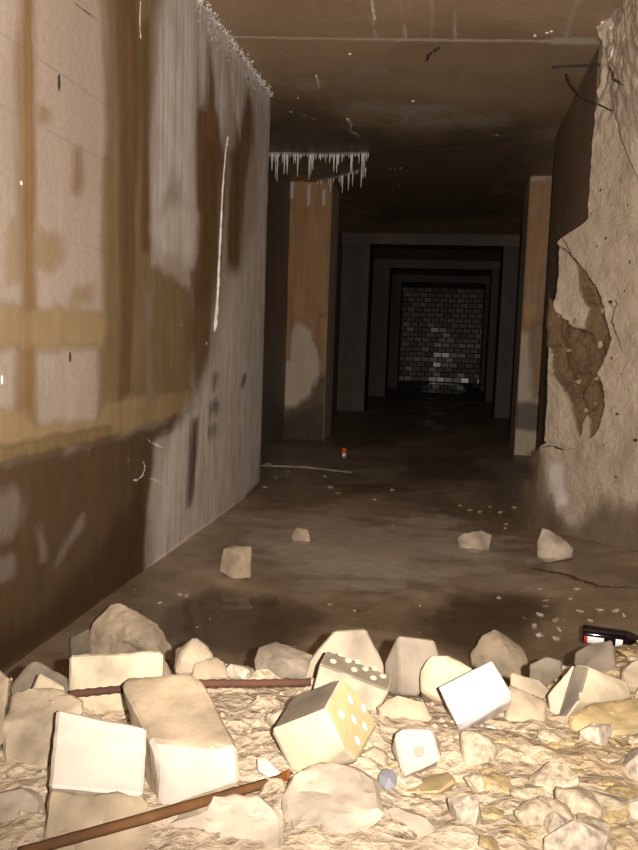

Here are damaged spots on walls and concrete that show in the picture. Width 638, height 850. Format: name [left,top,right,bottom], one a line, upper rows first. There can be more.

water stain [0,0,596,671]
spalling [547,266,612,437]
crack [556,226,622,350]
crack [530,567,638,588]